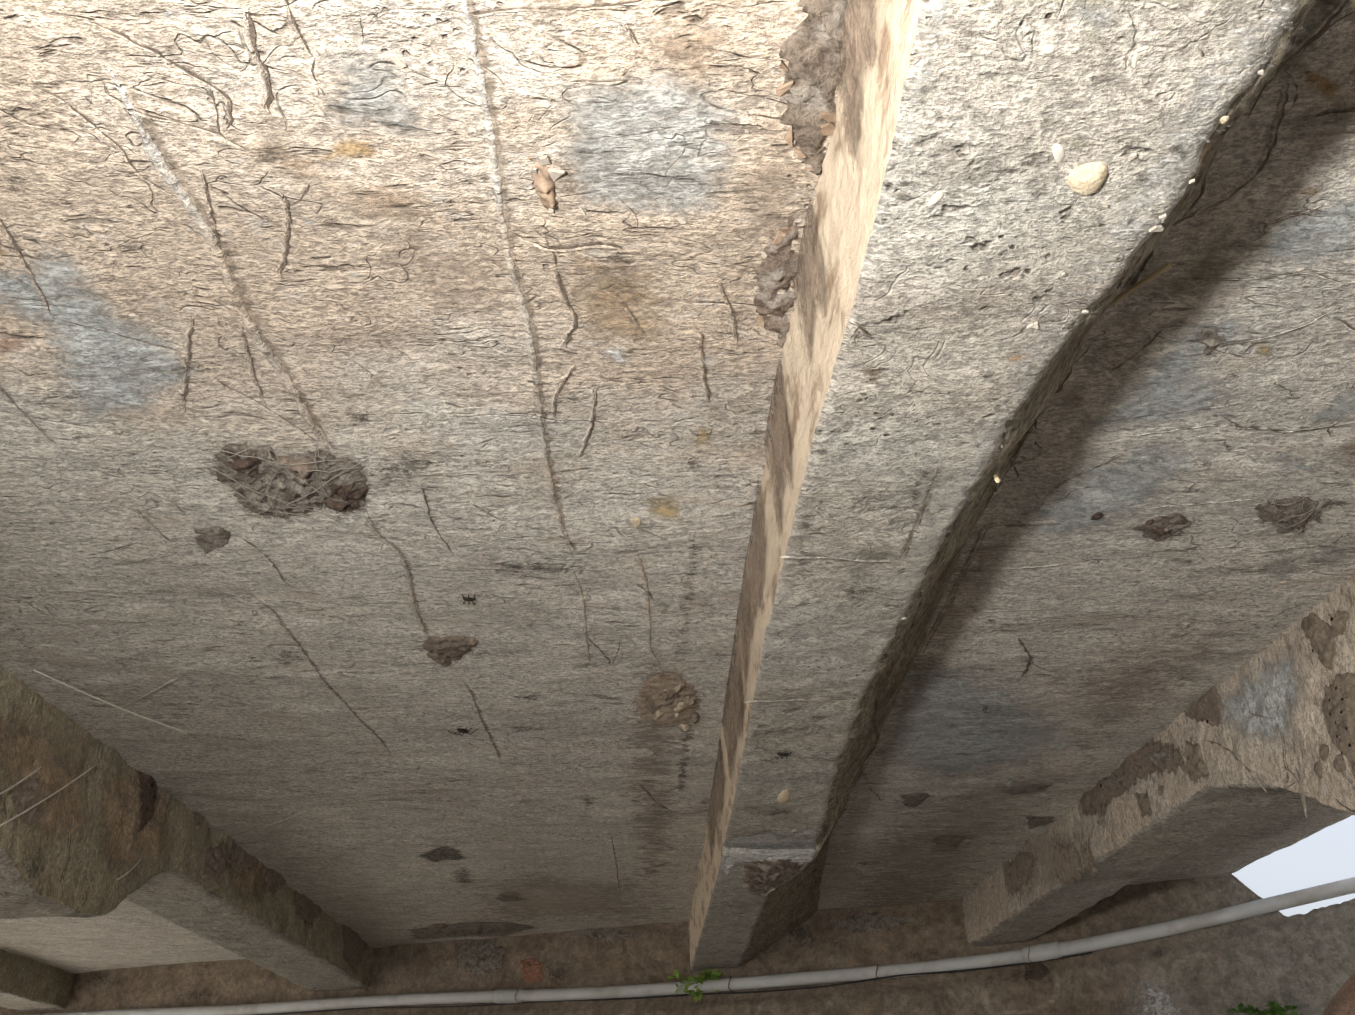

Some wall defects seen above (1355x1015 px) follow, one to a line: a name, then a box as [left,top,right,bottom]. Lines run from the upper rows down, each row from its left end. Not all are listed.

crack [87,6,274,151]
crack [280,0,327,100]
crack [361,0,719,44]
spalling [776,0,849,175]
crack [0,80,222,250]
crack [0,219,320,444]
crack [275,184,309,280]
crack [529,229,739,495]
spalling [753,219,802,347]
crack [1121,0,1355,358]
crack [1046,403,1355,496]
spalling [723,828,817,896]